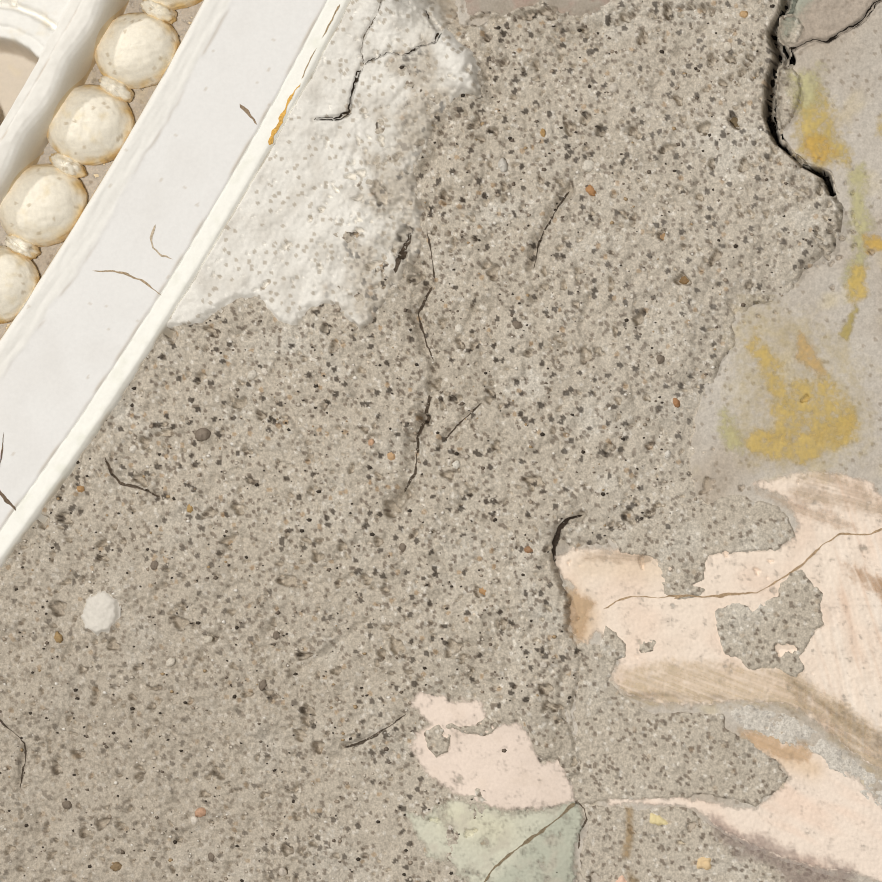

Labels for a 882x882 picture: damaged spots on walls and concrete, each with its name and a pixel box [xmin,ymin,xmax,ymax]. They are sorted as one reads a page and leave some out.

crack [302,5,340,78]
crack [314,2,440,121]
spalling [775,64,801,134]
spalling [776,14,804,46]
crack [767,0,880,196]
peeling [167,0,482,331]
peeling [555,471,882,769]
crack [604,528,882,609]
peeling [410,692,580,816]
spalling [570,642,882,882]
crack [484,801,587,882]
spalling [407,801,850,882]